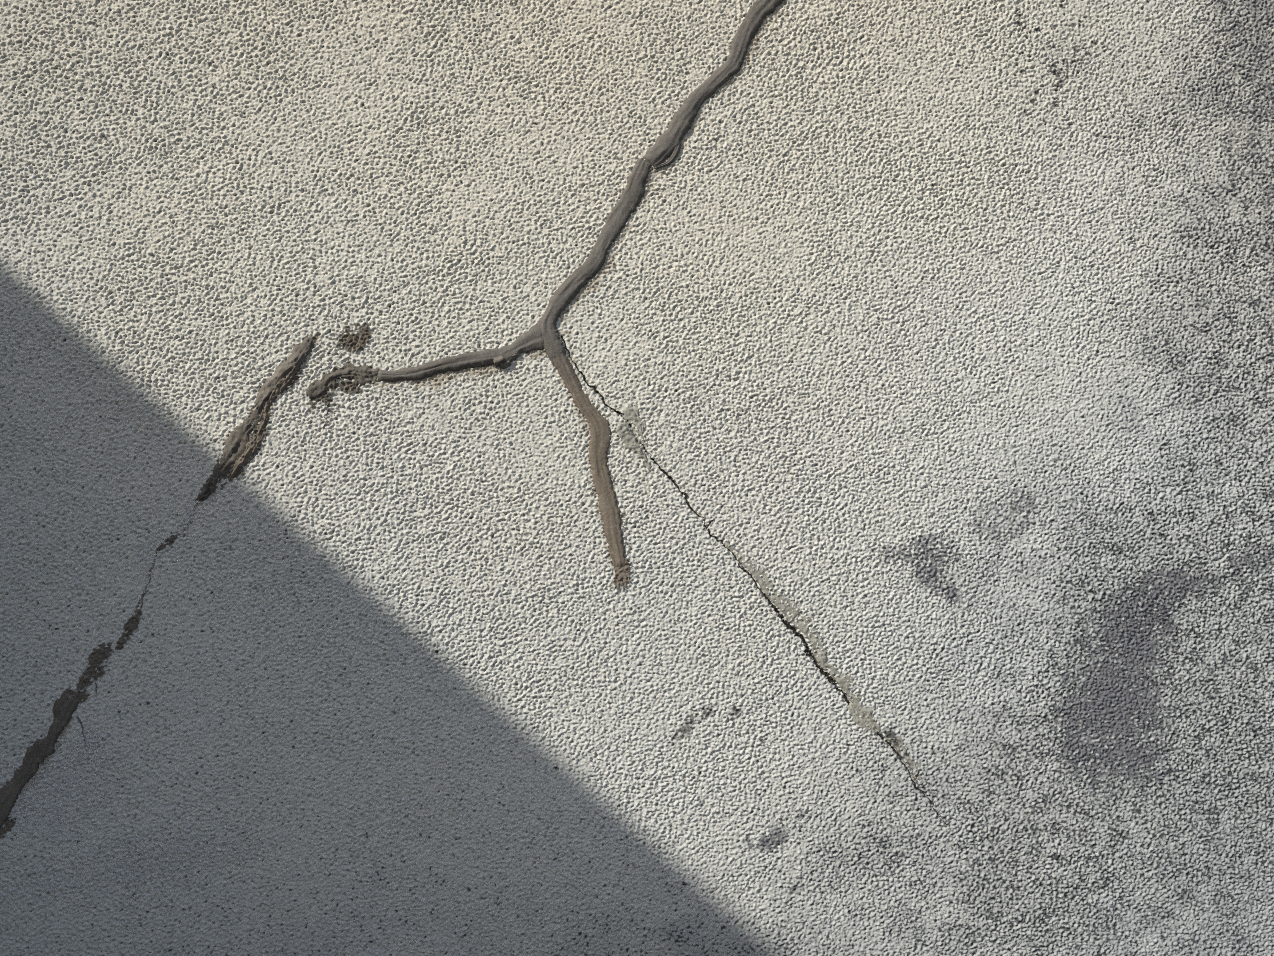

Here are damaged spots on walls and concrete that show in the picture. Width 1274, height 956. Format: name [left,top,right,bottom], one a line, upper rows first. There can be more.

crack [0,0,947,838]
leakage [879,536,962,602]
leakage [1050,565,1223,799]